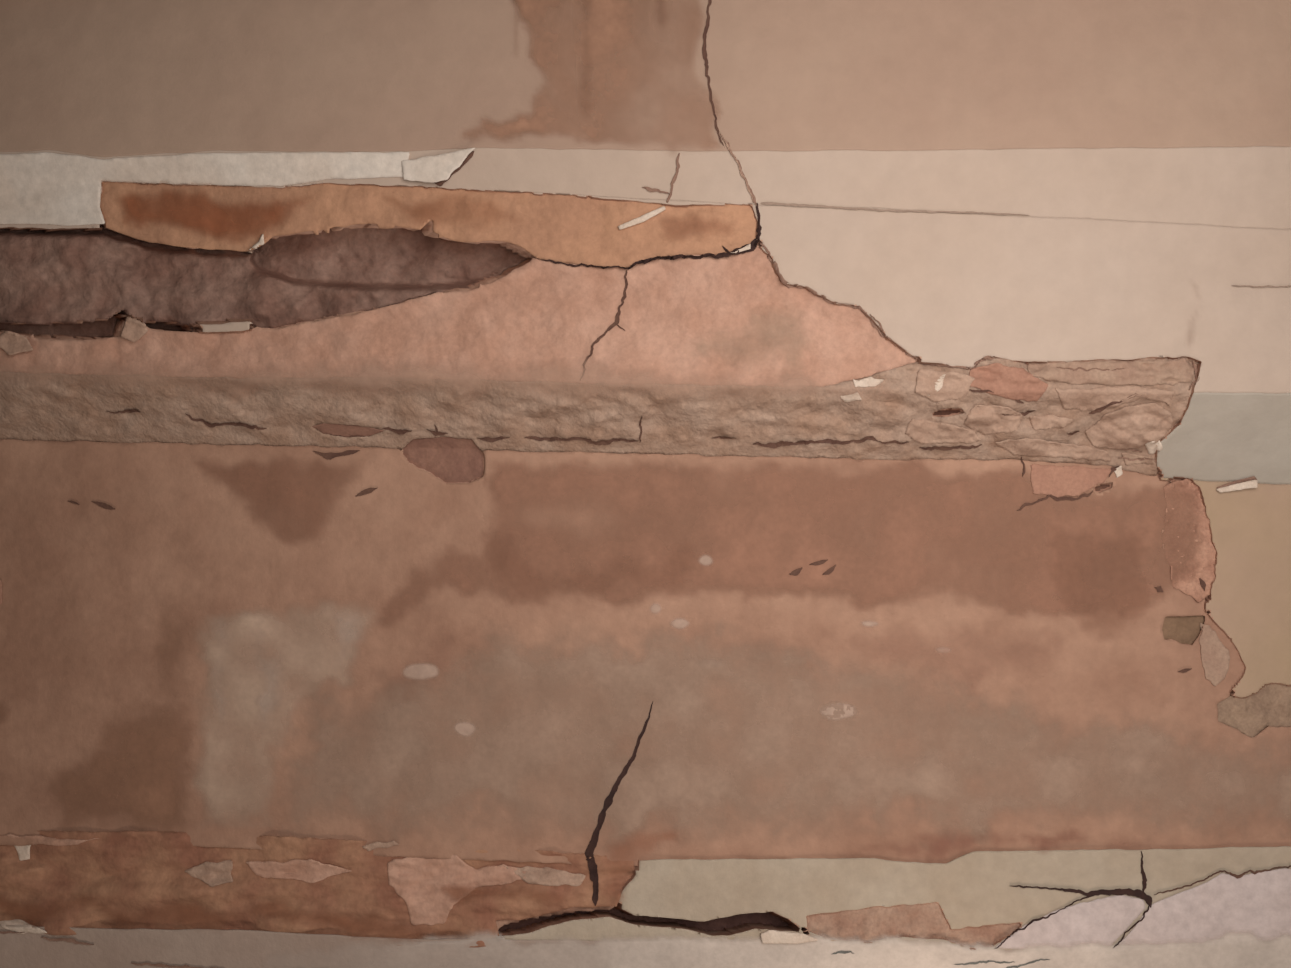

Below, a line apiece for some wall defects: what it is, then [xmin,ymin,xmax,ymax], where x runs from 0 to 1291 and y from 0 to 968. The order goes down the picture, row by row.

leakage [477,0,646,140]
crack [544,0,1035,416]
spalling [0,148,1199,502]
crack [1189,361,1200,390]
leakage [390,462,1193,616]
peeling [0,437,1291,949]
crack [498,702,788,931]
crack [954,851,1291,968]